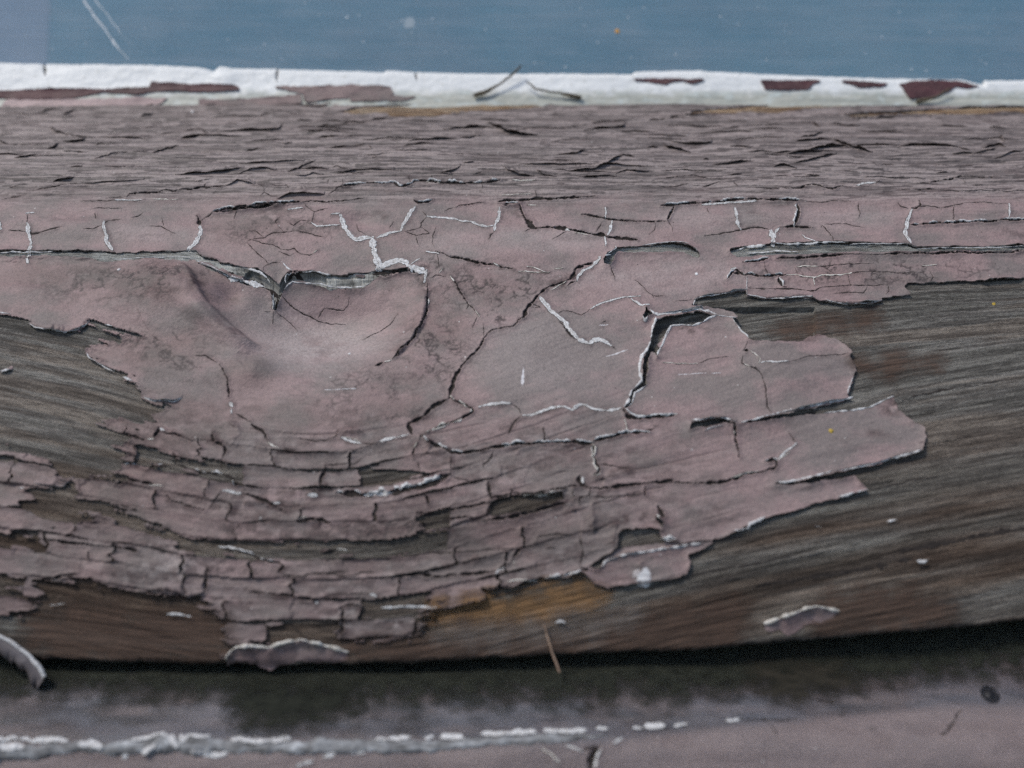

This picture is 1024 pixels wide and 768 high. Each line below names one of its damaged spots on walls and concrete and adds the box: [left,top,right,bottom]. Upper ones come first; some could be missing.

peeling [761,79,820,91]
peeling [842,79,978,100]
peeling [823,243,1024,254]
crack [0,110,1024,636]
peeling [0,278,1024,670]